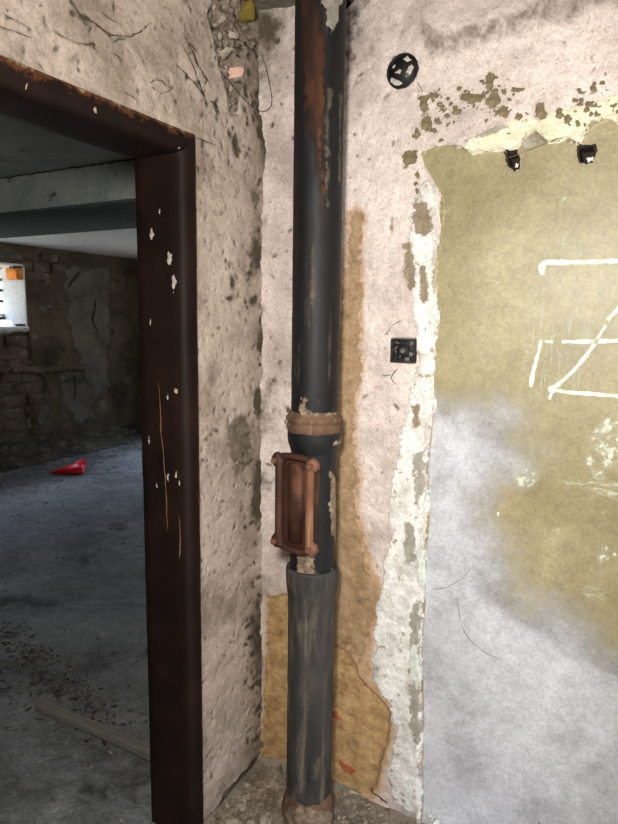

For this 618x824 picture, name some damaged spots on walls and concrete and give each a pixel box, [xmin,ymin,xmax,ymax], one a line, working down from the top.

crack [58,0,151,60]
crack [151,49,229,111]
spalling [207,0,260,113]
rust [301,0,327,192]
peeling [296,71,618,824]
spalling [222,594,288,801]